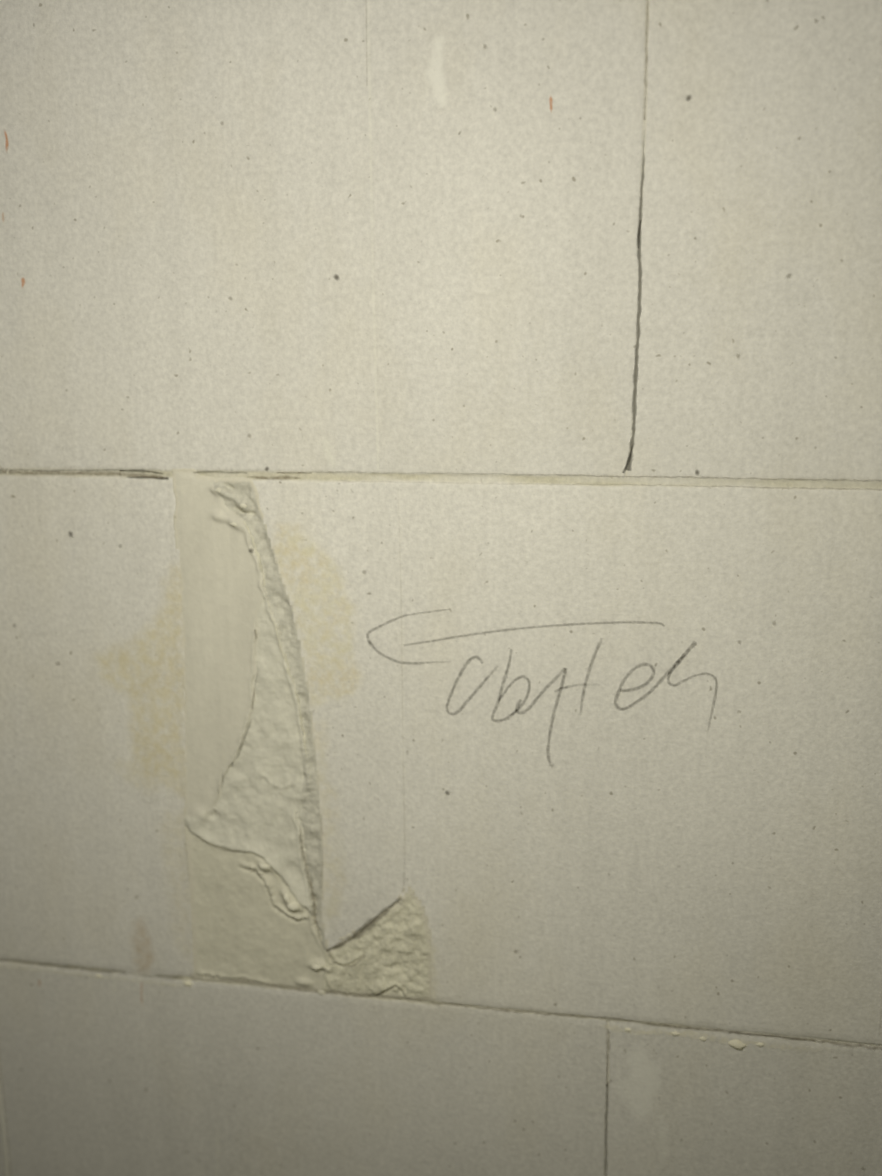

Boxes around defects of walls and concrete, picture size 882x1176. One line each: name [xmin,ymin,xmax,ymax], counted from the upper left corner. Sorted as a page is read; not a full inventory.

spalling [324,886,432,1003]